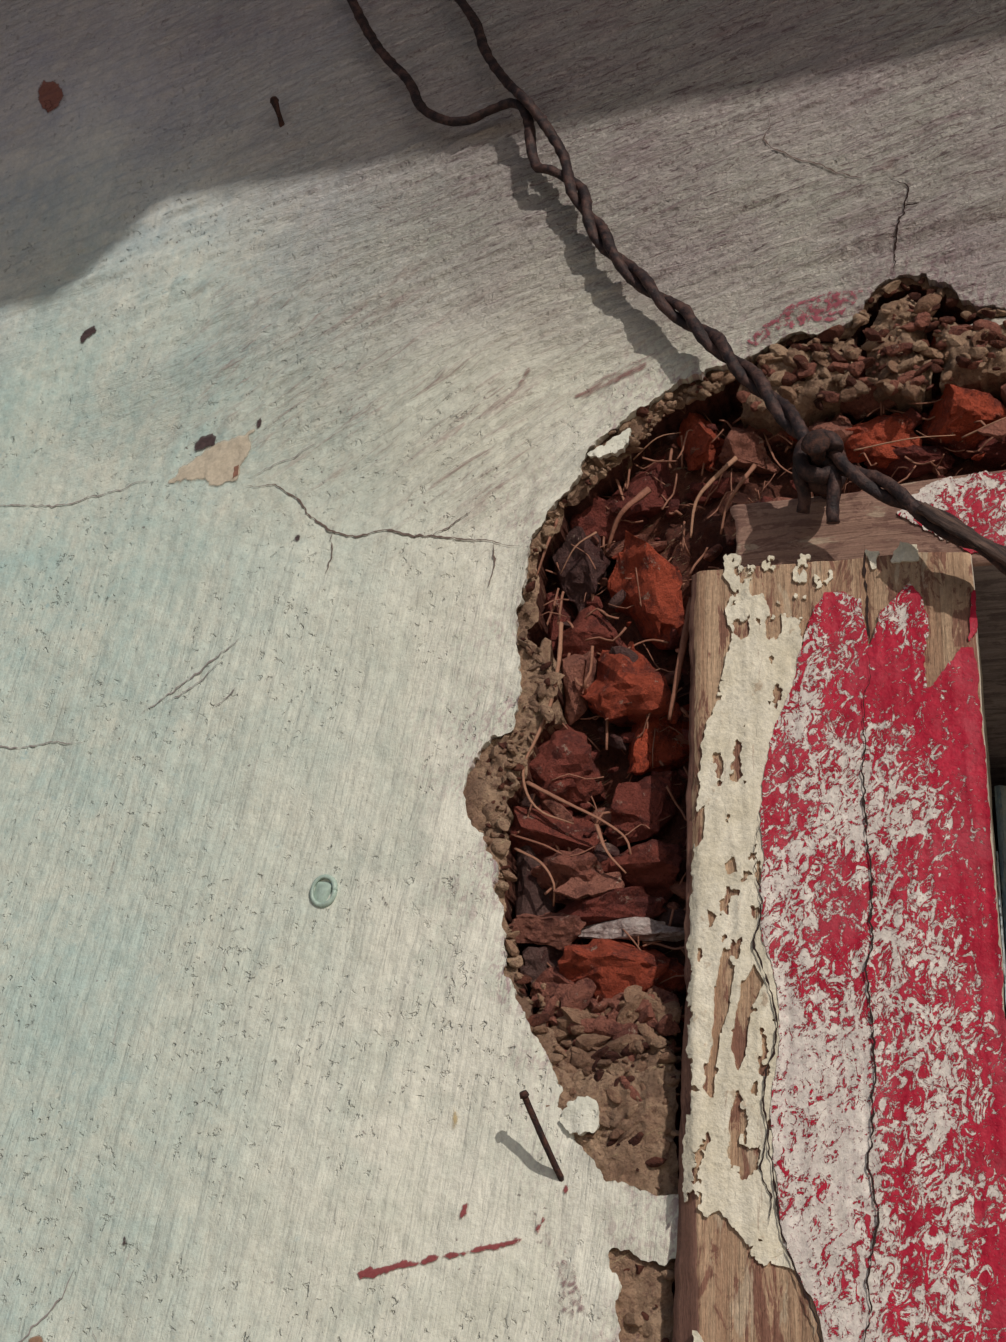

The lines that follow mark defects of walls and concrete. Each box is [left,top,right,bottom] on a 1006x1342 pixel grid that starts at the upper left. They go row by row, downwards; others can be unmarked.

crack [763,111,919,272]
crack [0,481,152,507]
peeling [169,418,262,486]
crack [247,440,514,586]
flaking render [455,276,1006,1196]
flaking render [608,1248,676,1342]